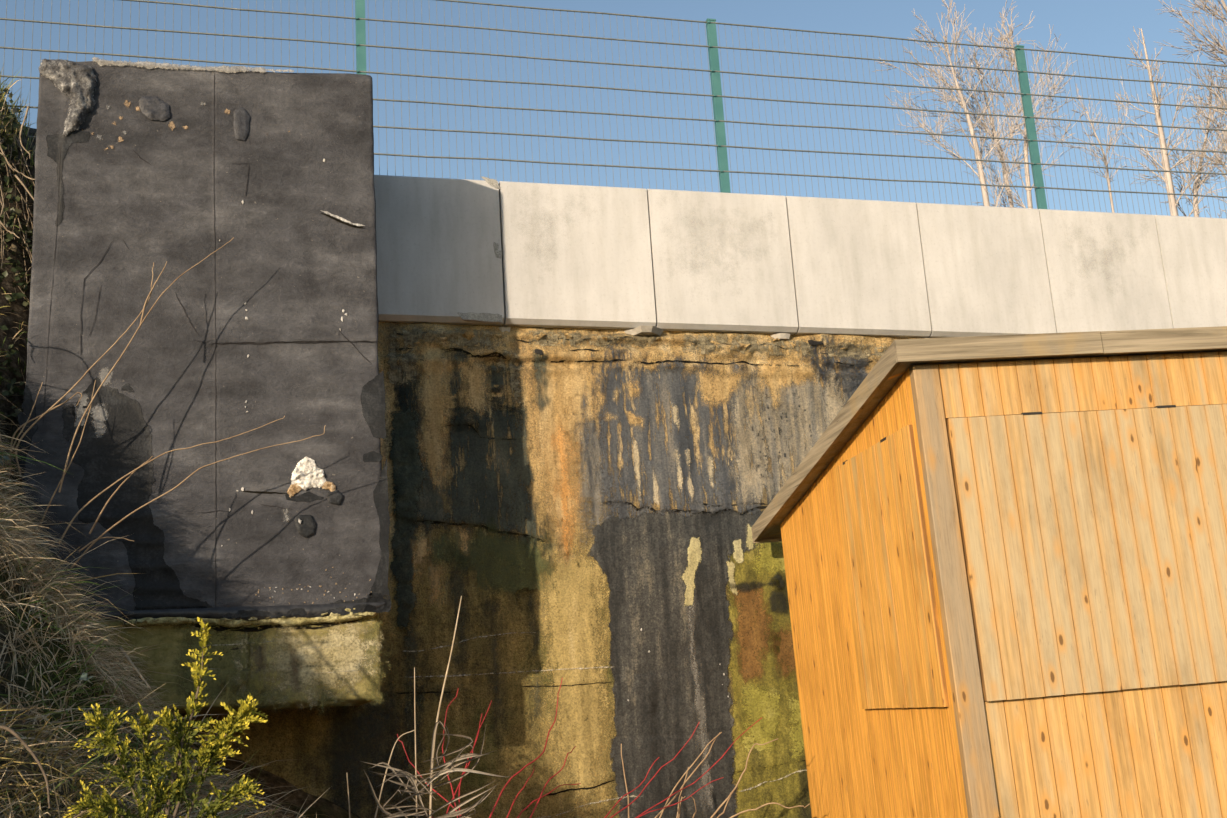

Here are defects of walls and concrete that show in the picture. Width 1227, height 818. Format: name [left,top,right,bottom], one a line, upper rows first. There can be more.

peeling [46,57,294,227]
crack [176,295,879,368]
peeling [627,412,643,425]
crack [420,520,545,542]
crack [604,501,767,515]
leakage [448,332,868,816]